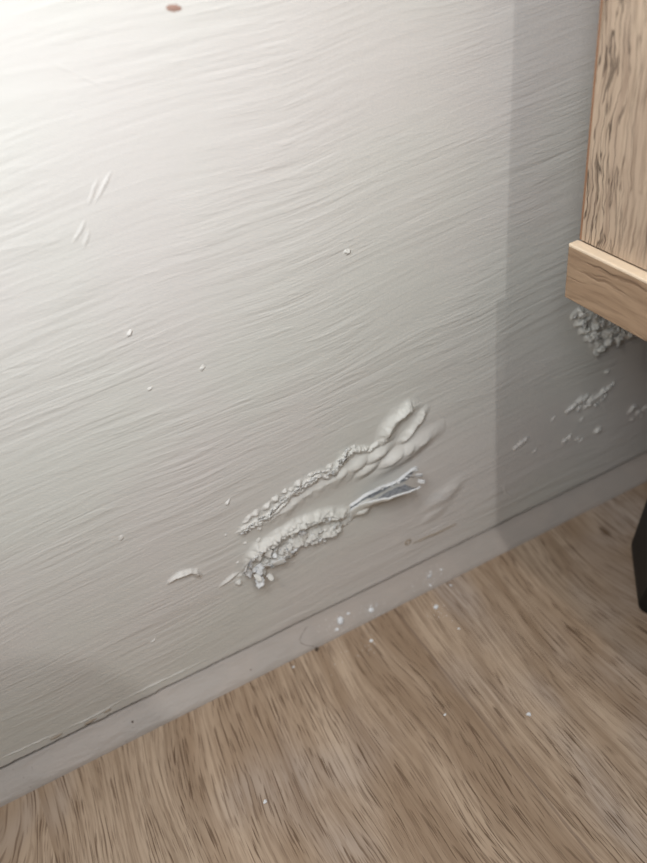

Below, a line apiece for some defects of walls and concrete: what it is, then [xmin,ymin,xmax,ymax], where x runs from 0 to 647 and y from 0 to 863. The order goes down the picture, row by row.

peeling [569,306,637,357]
peeling [218,397,446,590]